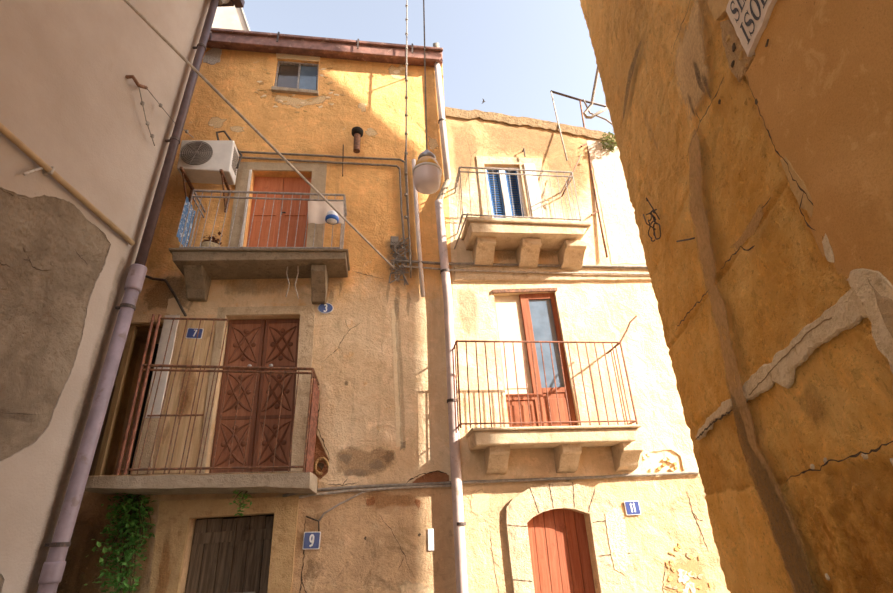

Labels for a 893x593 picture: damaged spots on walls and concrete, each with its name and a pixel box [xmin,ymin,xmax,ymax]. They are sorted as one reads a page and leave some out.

peeling [254,67,345,113]
crack [747,78,823,239]
crack [721,246,754,269]
peeling [0,187,110,461]
peeling [742,268,893,403]
peeling [695,399,733,440]
water stain [338,447,393,475]
crack [786,441,893,482]
crack [686,492,709,552]
crack [299,519,307,593]
peeling [665,543,712,593]